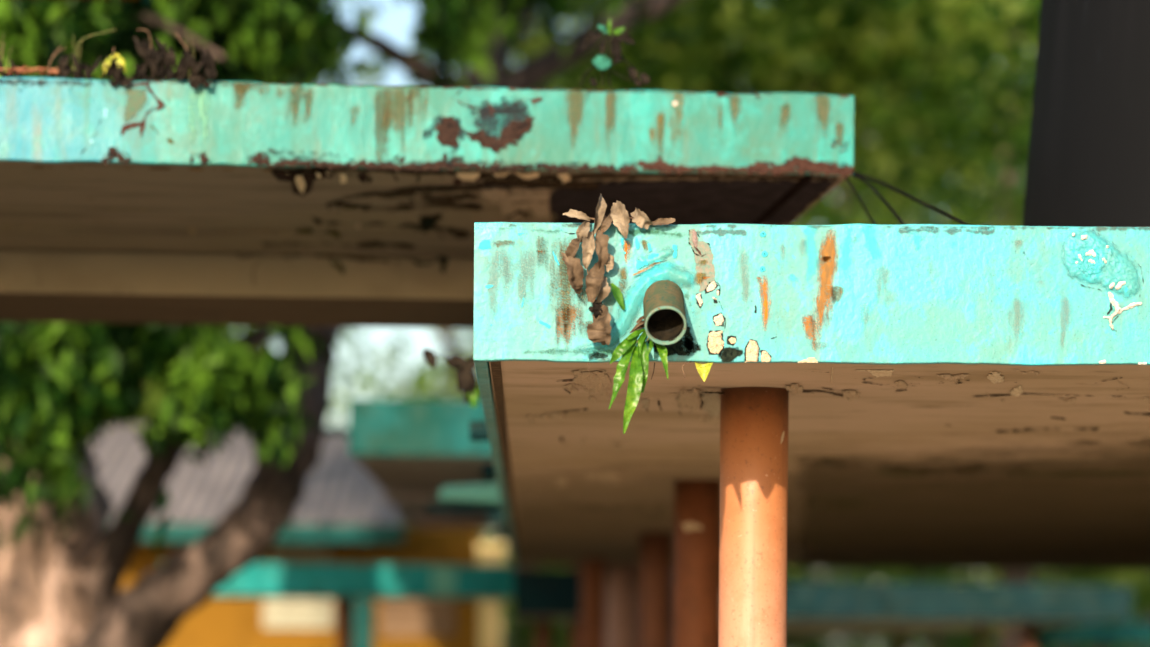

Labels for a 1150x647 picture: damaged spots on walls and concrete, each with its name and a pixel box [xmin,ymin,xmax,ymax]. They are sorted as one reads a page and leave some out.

corrosion [247,85,854,177]
spalling [271,167,837,223]
peeling [621,229,777,363]
corrosion [803,230,843,350]
peeling [785,357,920,402]